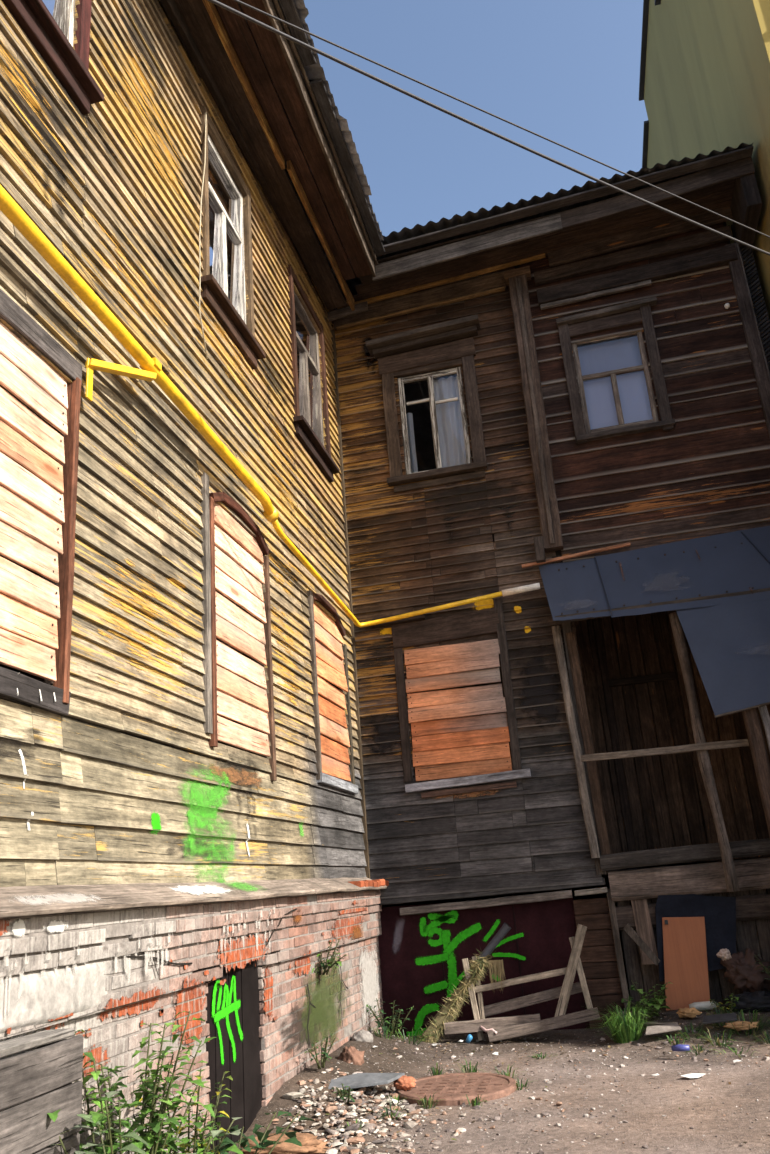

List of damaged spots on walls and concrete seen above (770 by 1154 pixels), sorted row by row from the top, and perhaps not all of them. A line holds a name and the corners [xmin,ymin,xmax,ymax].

flaking render [322,879,389,942]
flaking render [0,918,9,936]
flaking render [289,950,312,976]
flaking render [75,925,278,1077]
flaking render [45,1013,73,1030]
leakage [282,1001,319,1052]
spalling [337,1045,365,1065]